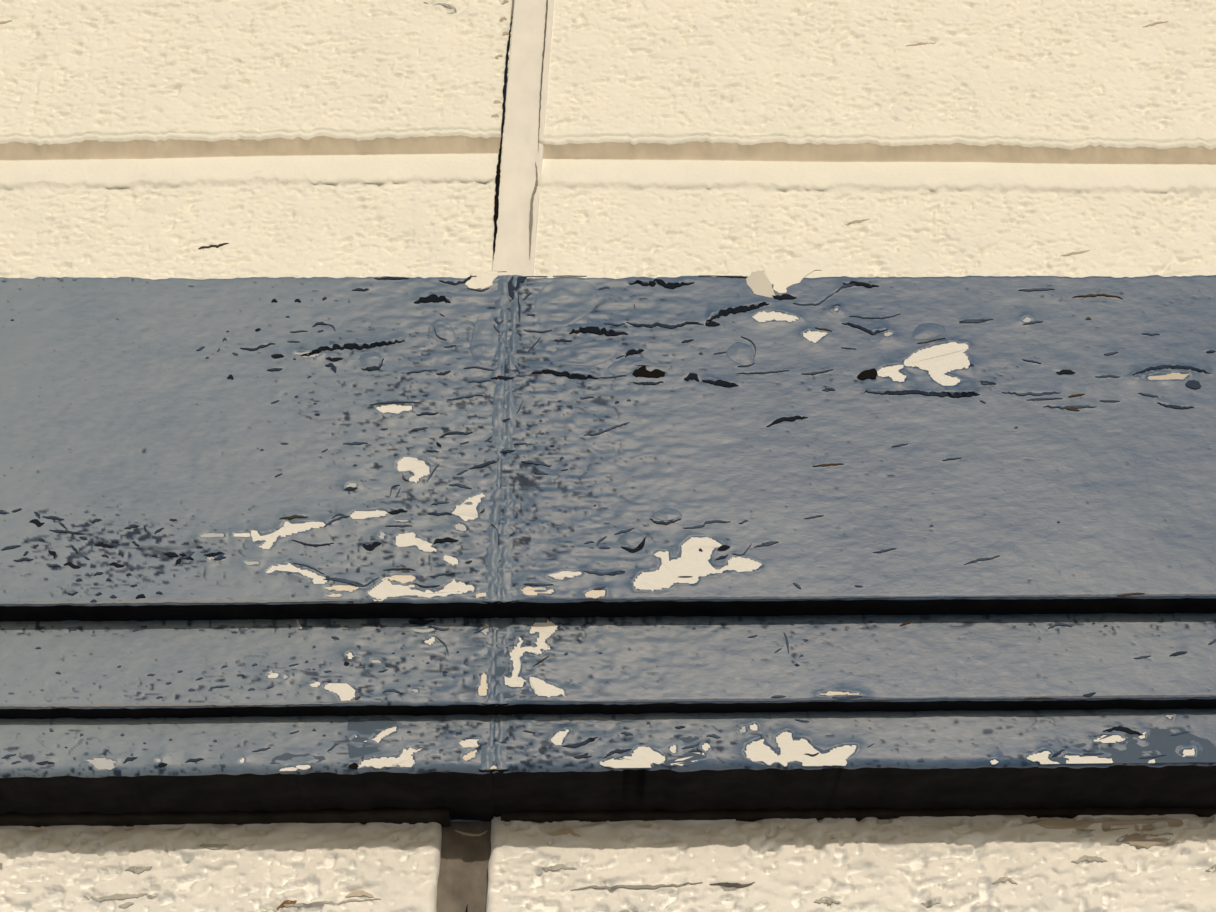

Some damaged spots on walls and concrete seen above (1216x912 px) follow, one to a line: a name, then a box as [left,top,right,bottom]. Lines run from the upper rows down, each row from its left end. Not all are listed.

crack [196,0,1216,590]
peeling [877,342,974,386]
peeling [397,457,430,483]
spalling [0,508,177,602]
peeling [151,510,486,602]
peeling [633,537,762,591]
crack [1117,590,1145,598]
crack [408,618,487,656]
peeling [505,619,566,697]
peeling [353,727,423,769]
peeling [740,723,856,767]
peeling [1027,732,1146,764]